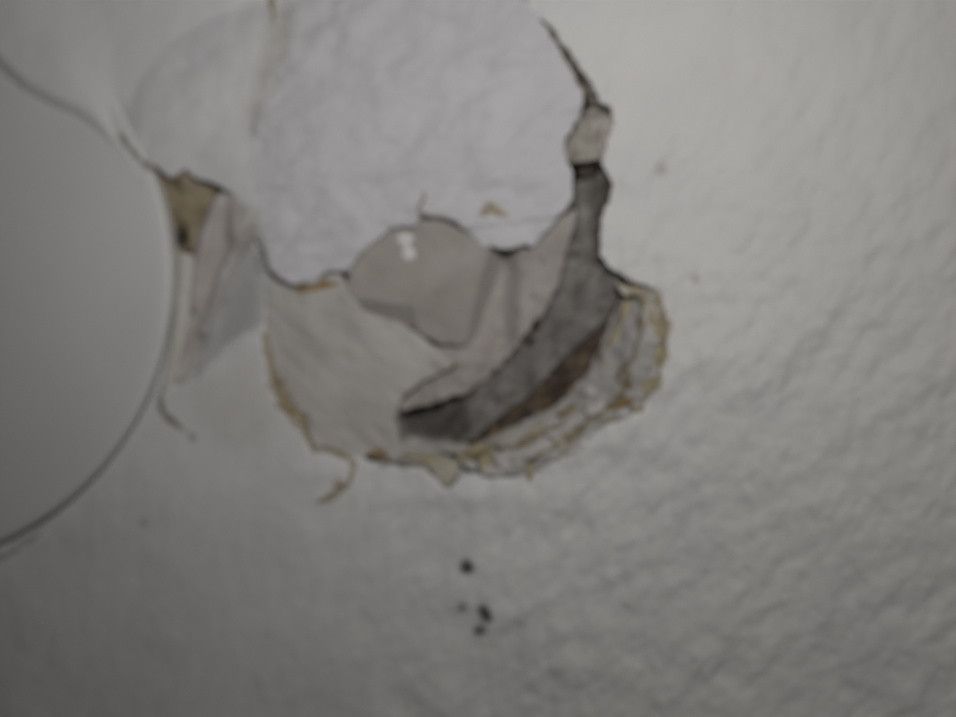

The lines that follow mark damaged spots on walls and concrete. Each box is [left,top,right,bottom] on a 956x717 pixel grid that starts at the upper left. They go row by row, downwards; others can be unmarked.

flaking render [153,0,665,488]